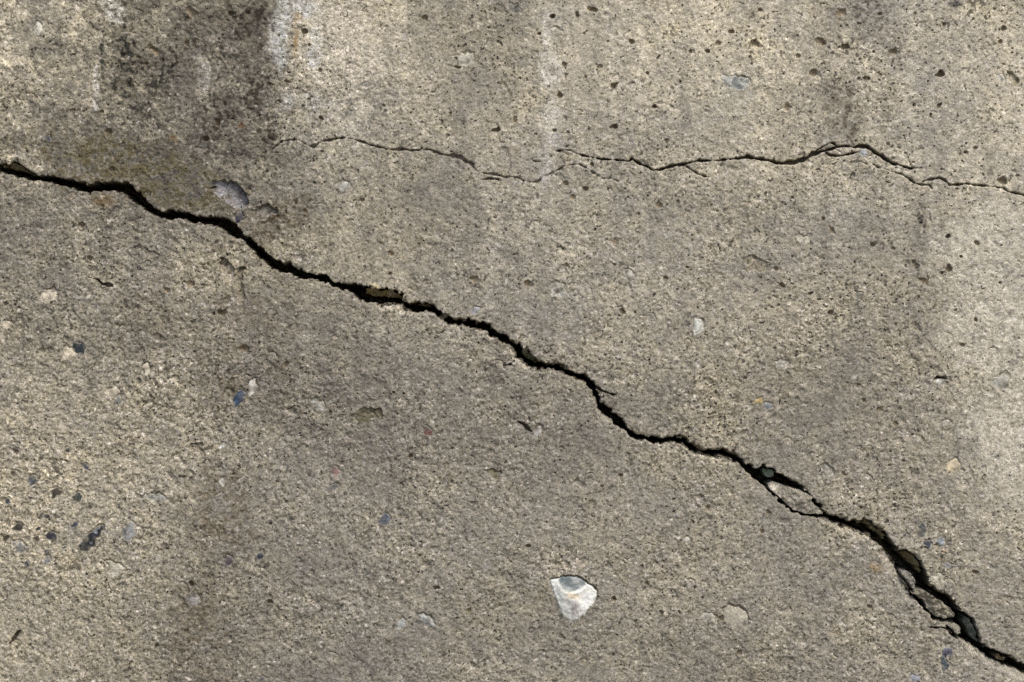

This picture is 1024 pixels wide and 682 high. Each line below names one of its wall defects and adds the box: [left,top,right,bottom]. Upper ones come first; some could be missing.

crack [0,160,1024,673]
crack [272,137,1024,196]